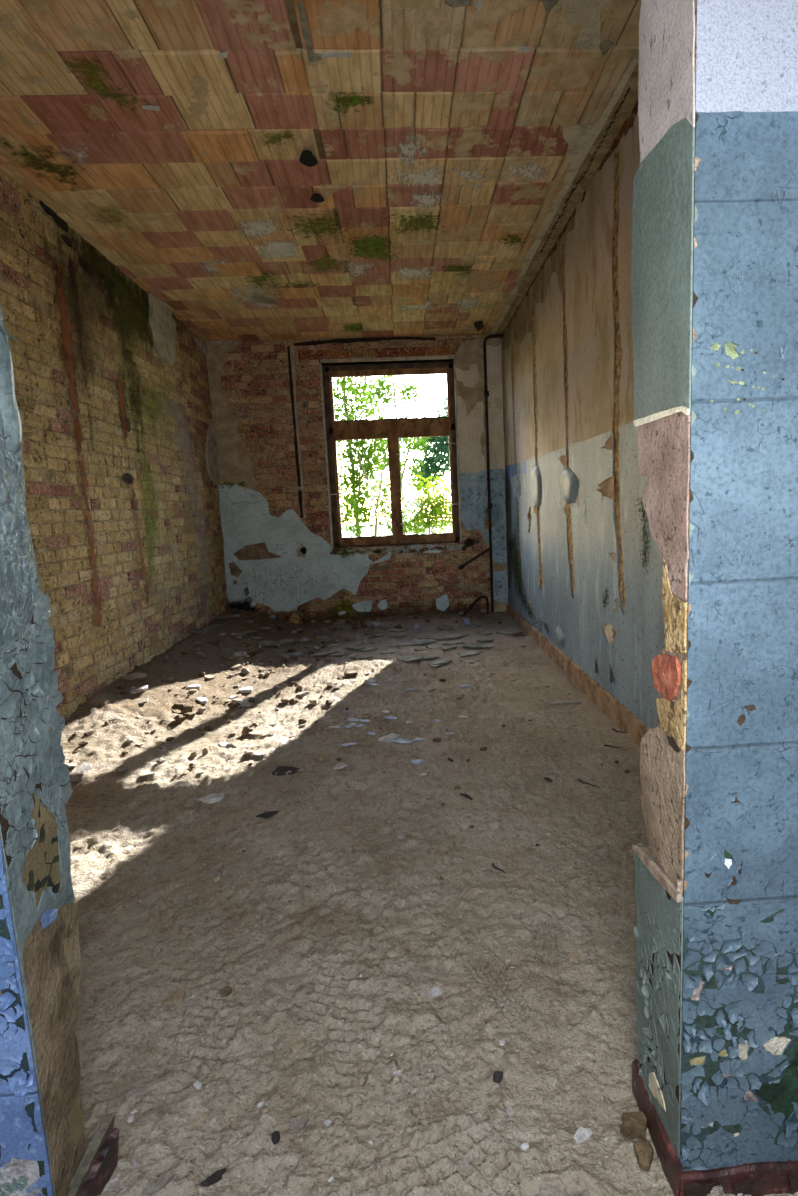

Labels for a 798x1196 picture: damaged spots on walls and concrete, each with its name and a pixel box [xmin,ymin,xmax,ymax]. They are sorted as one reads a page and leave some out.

peeling [455,48,639,603]
crack [0,590,72,1196]
spalling [0,794,86,1196]
spalling [229,542,281,610]
spalling [624,406,697,903]
crack [633,803,798,1170]